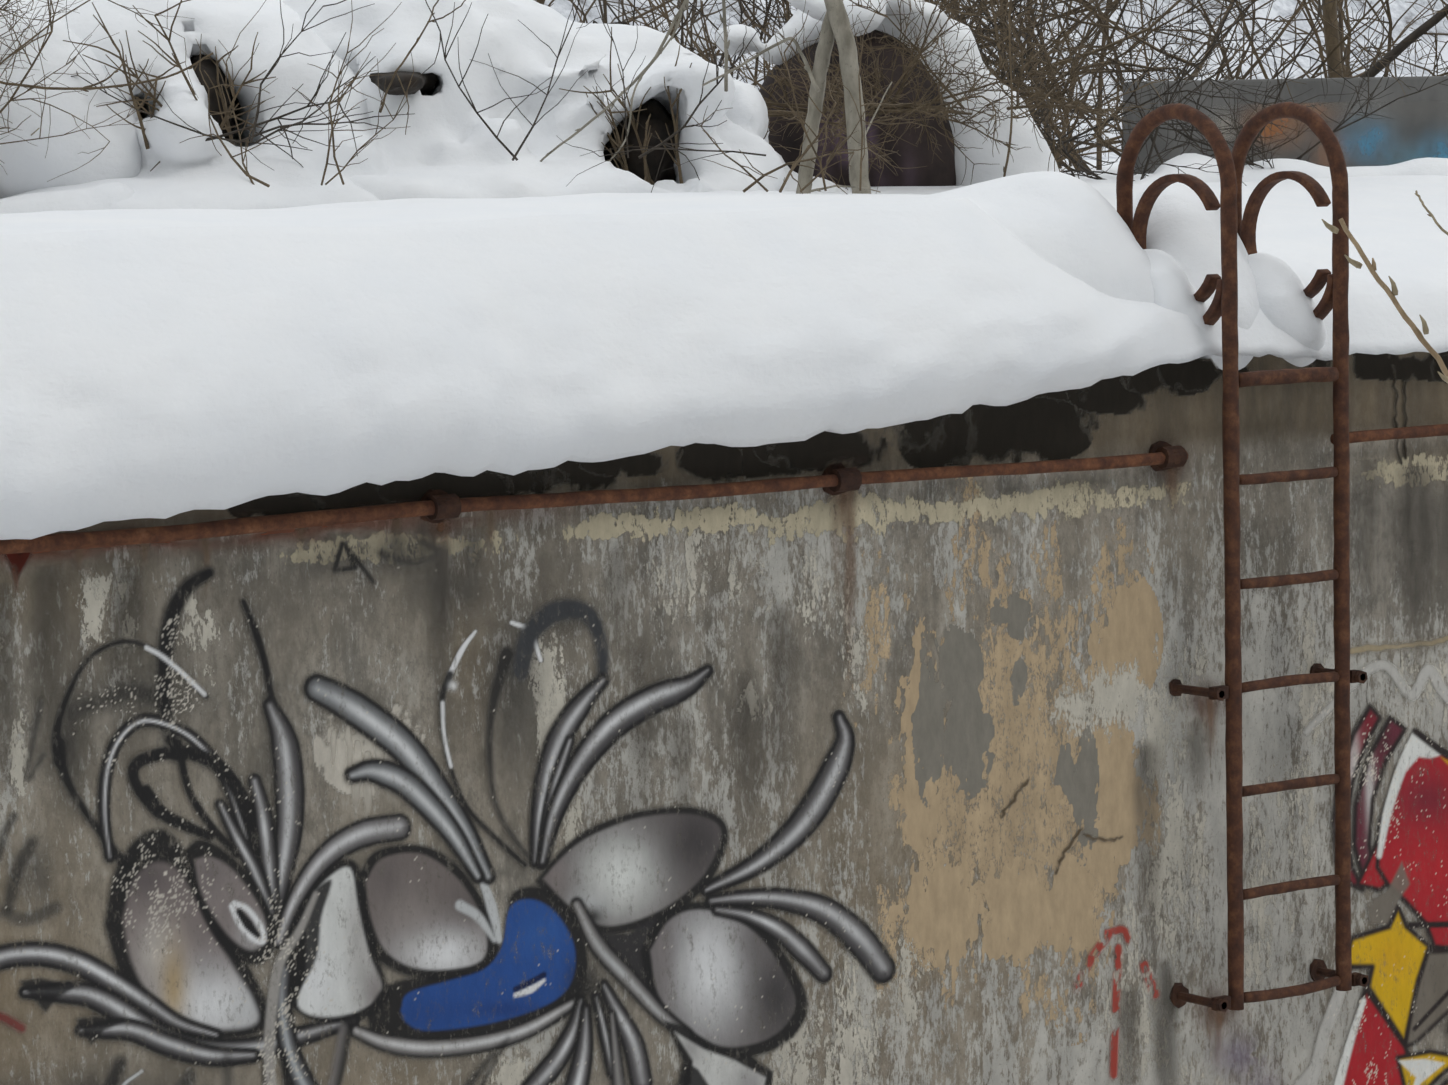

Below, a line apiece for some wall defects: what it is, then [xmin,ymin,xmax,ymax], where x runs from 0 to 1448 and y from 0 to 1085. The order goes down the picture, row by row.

peeling [643,477,1221,1085]
crack [1001,779,1029,818]
crack [1055,828,1123,875]